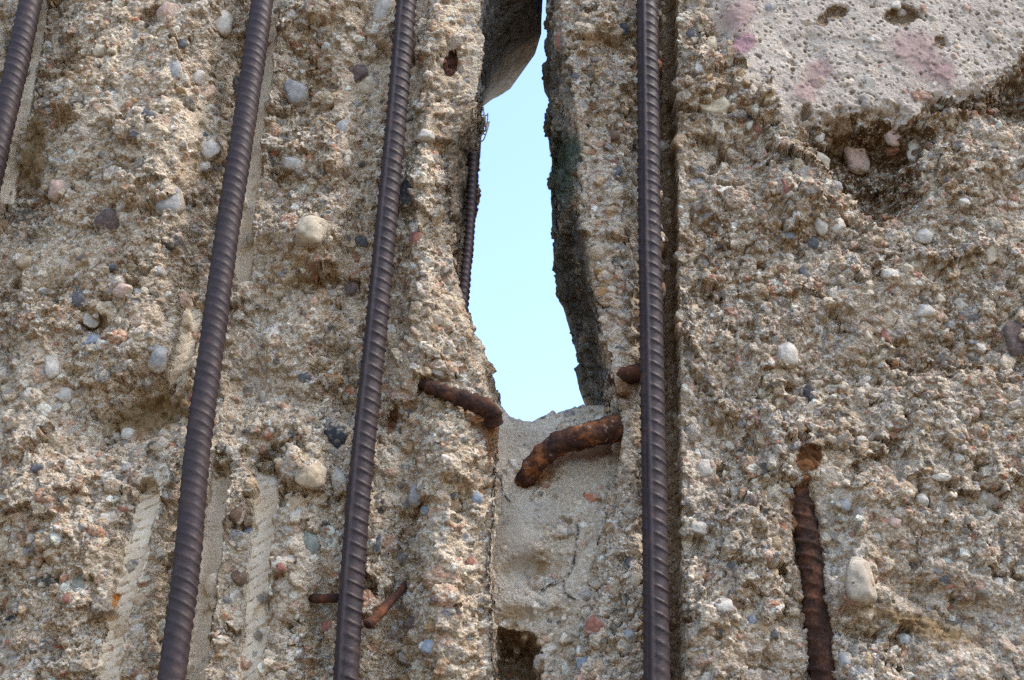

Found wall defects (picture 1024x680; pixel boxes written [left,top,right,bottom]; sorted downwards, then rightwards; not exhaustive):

peeling [704,0,1024,230]
corrosion [418,378,504,469]
corrosion [514,363,640,489]
corrosion [796,443,822,541]
spalling [495,626,545,680]